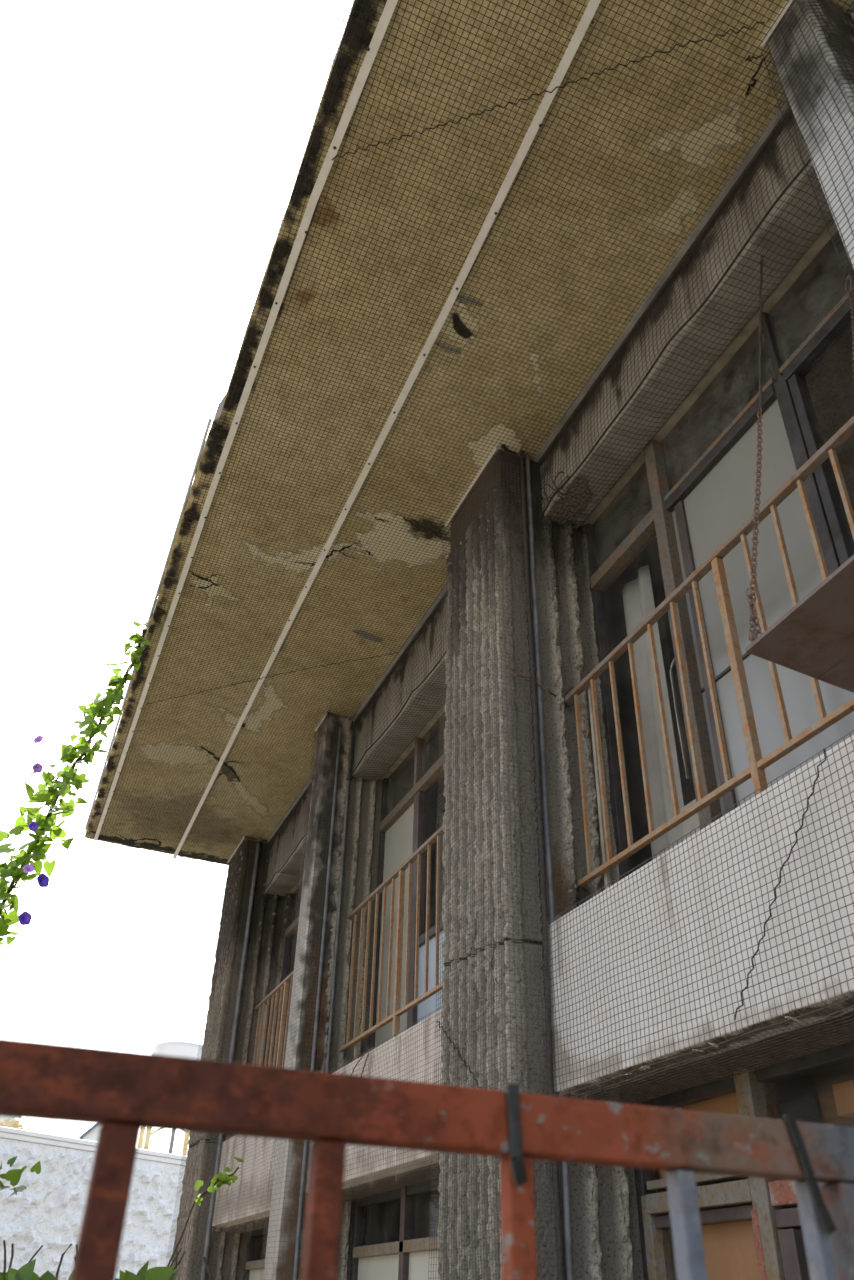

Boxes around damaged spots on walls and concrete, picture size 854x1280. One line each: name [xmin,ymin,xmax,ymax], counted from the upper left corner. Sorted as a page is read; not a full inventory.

crack [740,54,767,97]
efflorescence [646,97,743,168]
damp [653,188,702,234]
spalling [437,295,482,354]
peeling [242,509,451,577]
crack [190,571,222,589]
damp [87,233,714,1072]
crack [200,746,240,782]
crack [443,921,542,980]